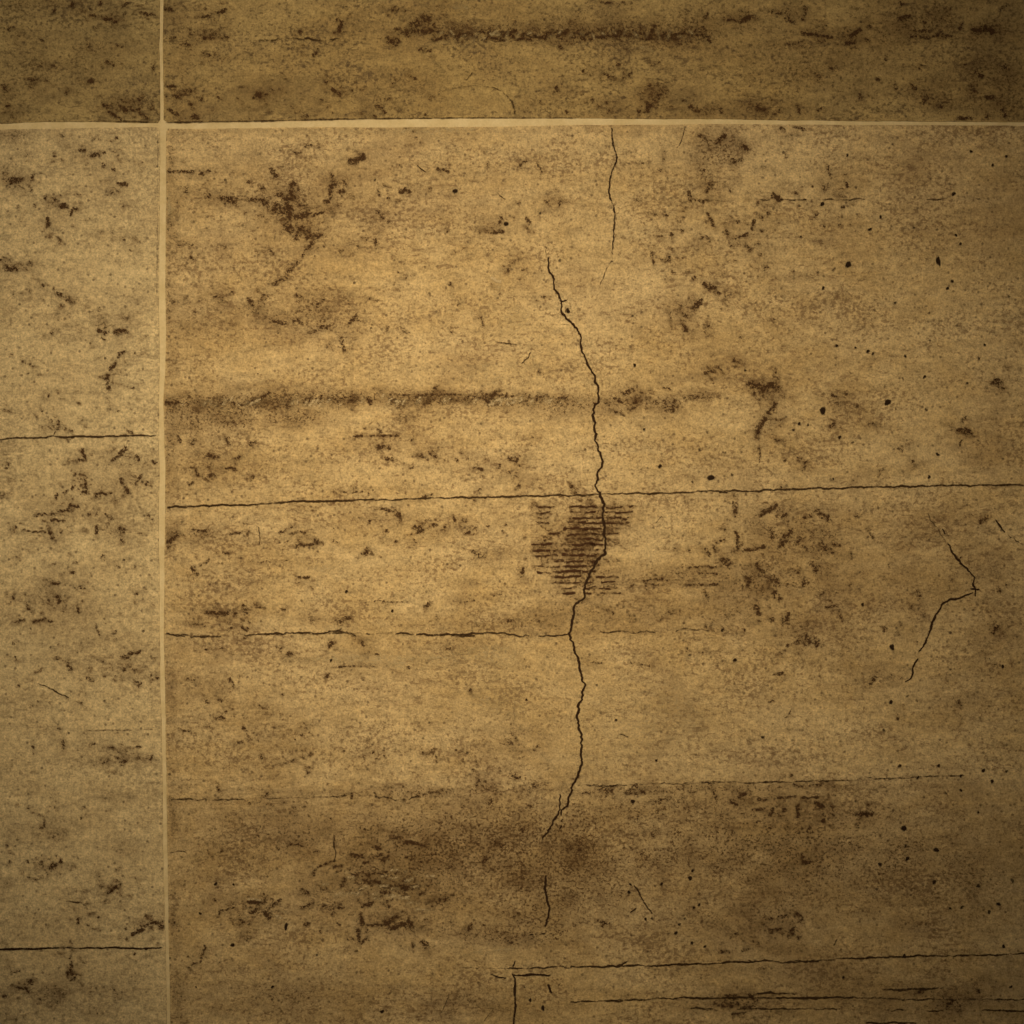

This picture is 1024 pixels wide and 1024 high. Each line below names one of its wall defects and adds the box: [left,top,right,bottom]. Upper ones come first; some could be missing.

crack [600,128,618,284]
crack [542,247,607,840]
leakage [520,482,852,655]
crack [905,516,980,682]
crack [484,961,560,1024]